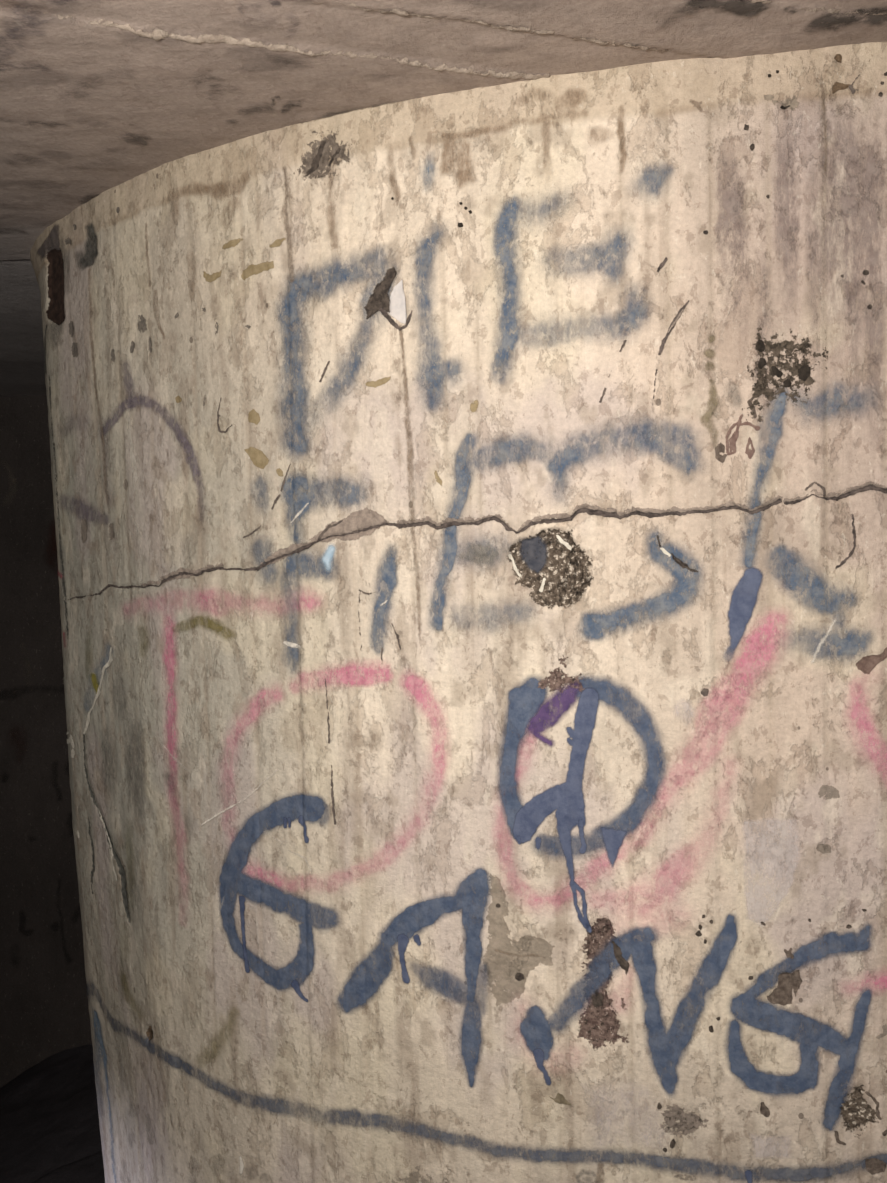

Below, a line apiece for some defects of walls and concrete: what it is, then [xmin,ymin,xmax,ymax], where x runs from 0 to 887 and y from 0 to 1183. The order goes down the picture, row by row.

spalling [293,127,355,186]
spalling [37,224,98,358]
crack [88,269,106,483]
spalling [130,315,152,353]
spalling [365,267,412,331]
spalling [715,328,828,463]
crack [44,325,887,661]
spalling [467,529,594,609]
crack [83,647,130,922]
spalling [577,918,629,1050]
spalling [657,1103,709,1152]
spalling [835,1085,887,1145]